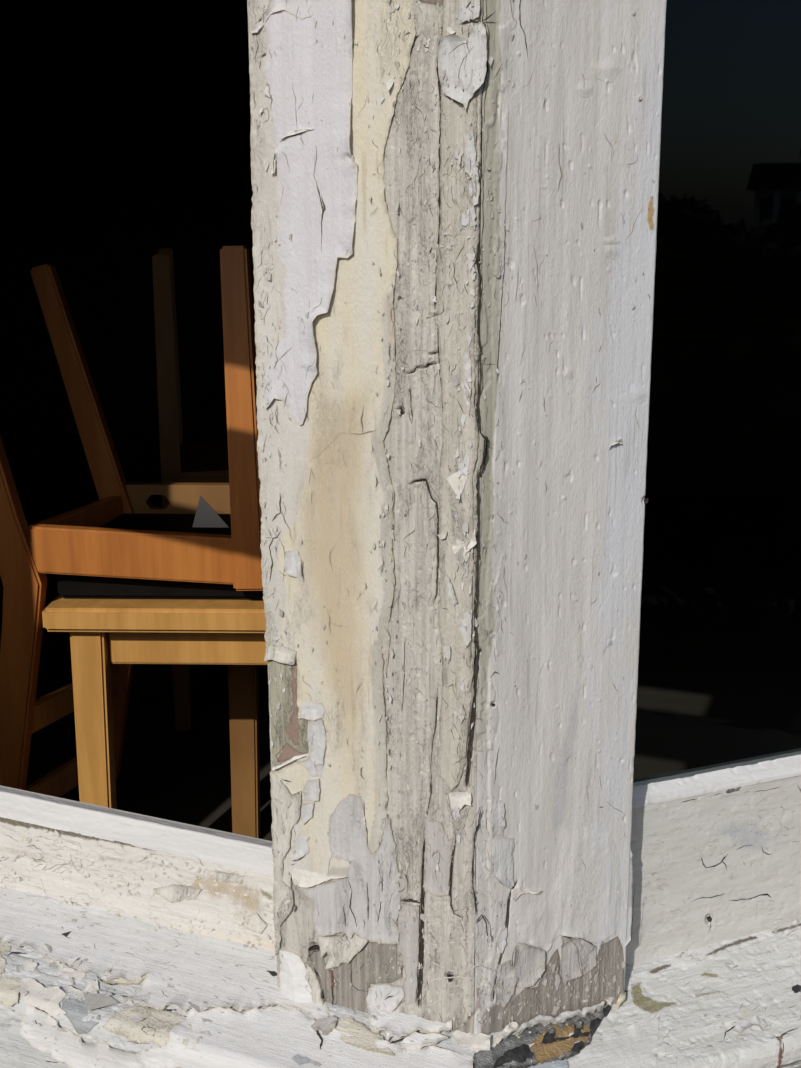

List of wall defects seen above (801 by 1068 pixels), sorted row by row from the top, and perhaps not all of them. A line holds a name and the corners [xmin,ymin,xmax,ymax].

crack [0,0,599,1045]
crack [608,784,801,993]